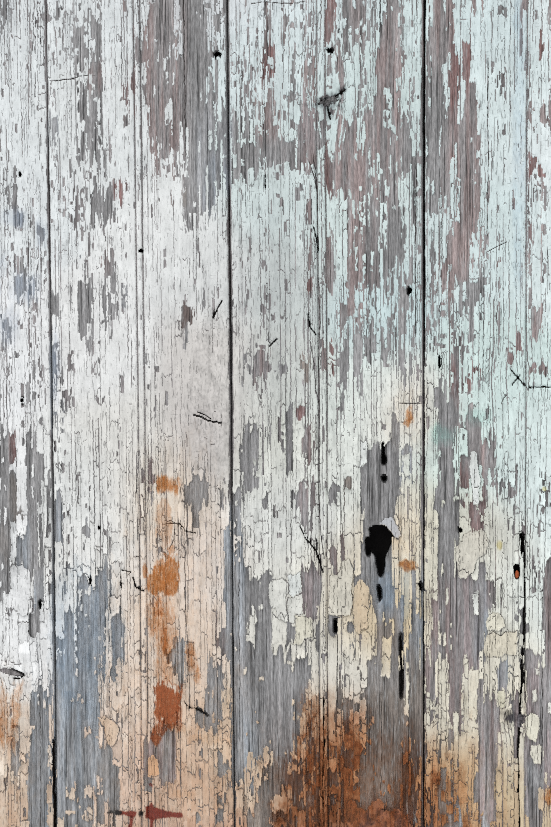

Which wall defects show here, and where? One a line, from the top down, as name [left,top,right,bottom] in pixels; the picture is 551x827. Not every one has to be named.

peeling [41,0,129,232]
crack [194,412,220,423]
crack [501,370,551,403]
peeling [0,165,134,827]
corrosion [151,681,181,744]